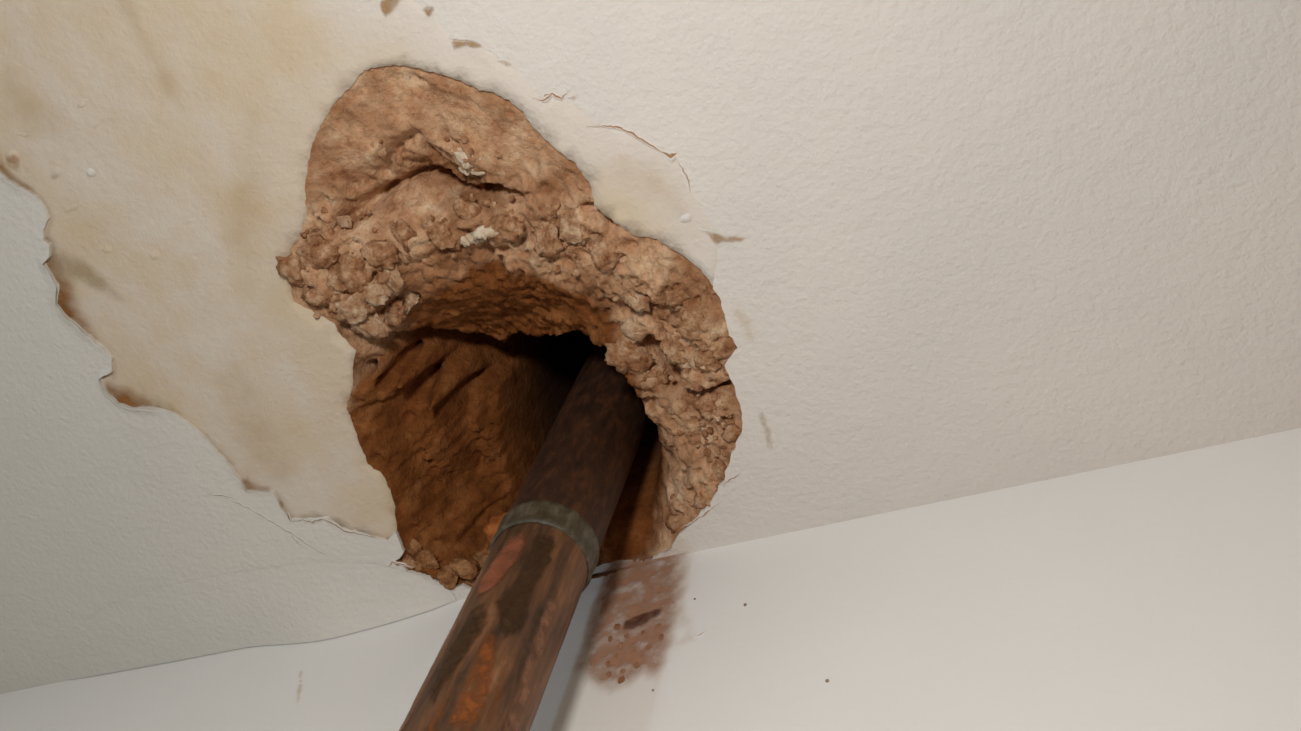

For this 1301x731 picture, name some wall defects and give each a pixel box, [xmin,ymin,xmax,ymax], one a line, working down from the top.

crack [535,91,569,103]
crack [586,124,691,192]
peeling [0,0,743,594]